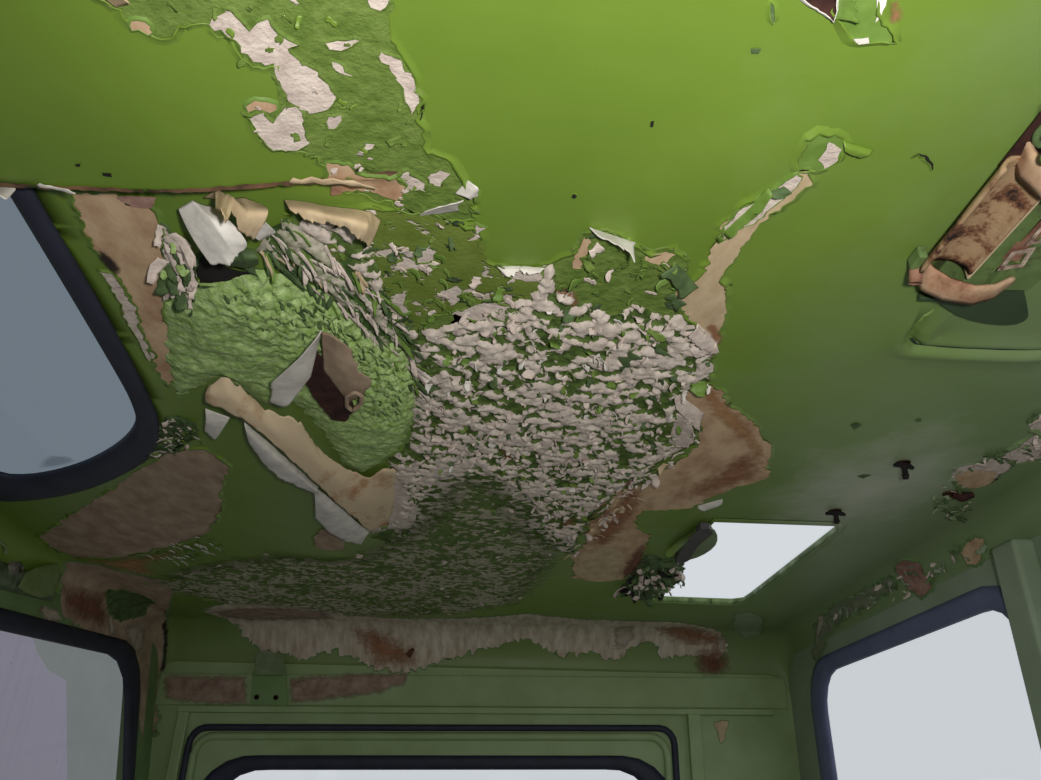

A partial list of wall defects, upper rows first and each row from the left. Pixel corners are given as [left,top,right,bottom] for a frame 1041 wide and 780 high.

peeling [800,0,902,48]
corrosion [964,199,1041,279]
peeling [34,0,873,744]
peeling [932,413,1041,523]
peeling [811,535,987,663]